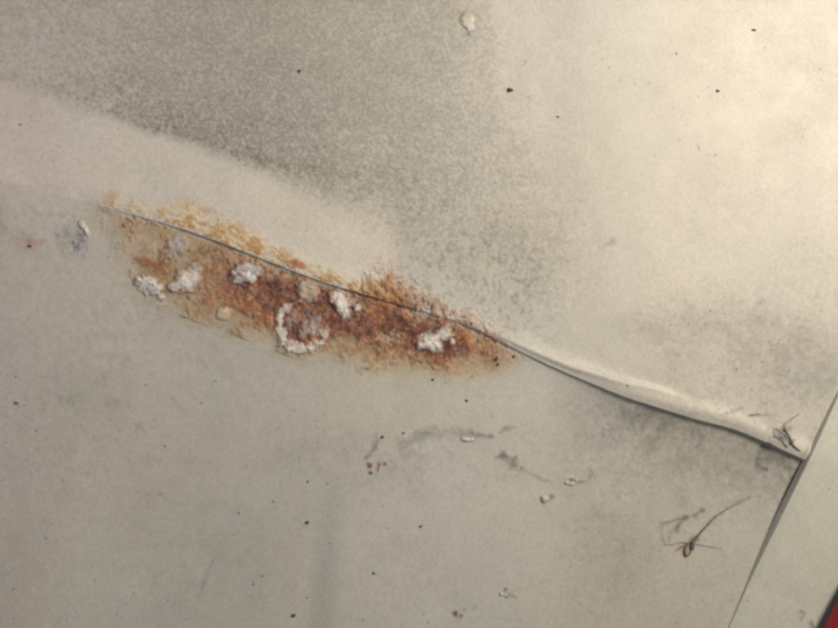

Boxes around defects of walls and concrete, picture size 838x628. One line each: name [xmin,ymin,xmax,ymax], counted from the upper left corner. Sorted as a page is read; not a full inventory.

corrosion [73,187,535,396]